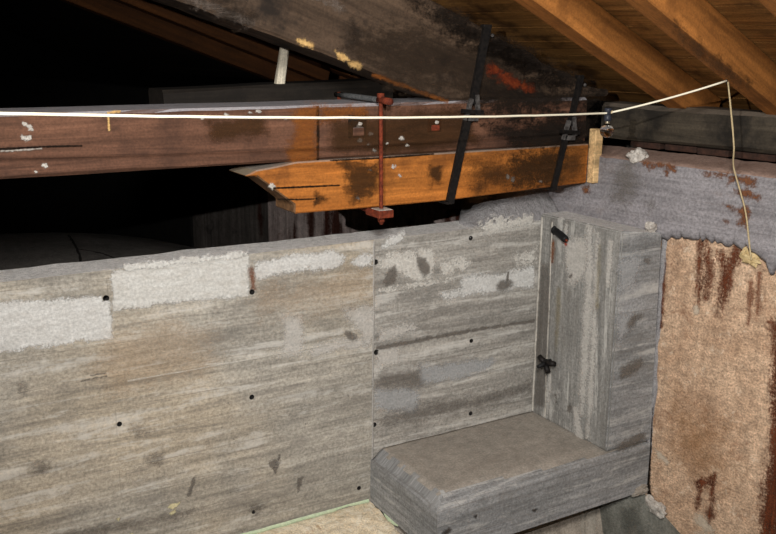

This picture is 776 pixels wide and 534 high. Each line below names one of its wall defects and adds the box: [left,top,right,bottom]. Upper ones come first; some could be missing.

rust [488,65,532,92]
rust [643,161,677,176]
crack [68,235,115,262]
water stain [0,231,538,353]
efflorescence [475,213,535,236]
rust [695,240,742,314]
rust [705,172,761,227]
spalling [739,247,761,268]
water stain [278,305,535,367]
rust [758,320,776,534]
rust [695,473,717,525]